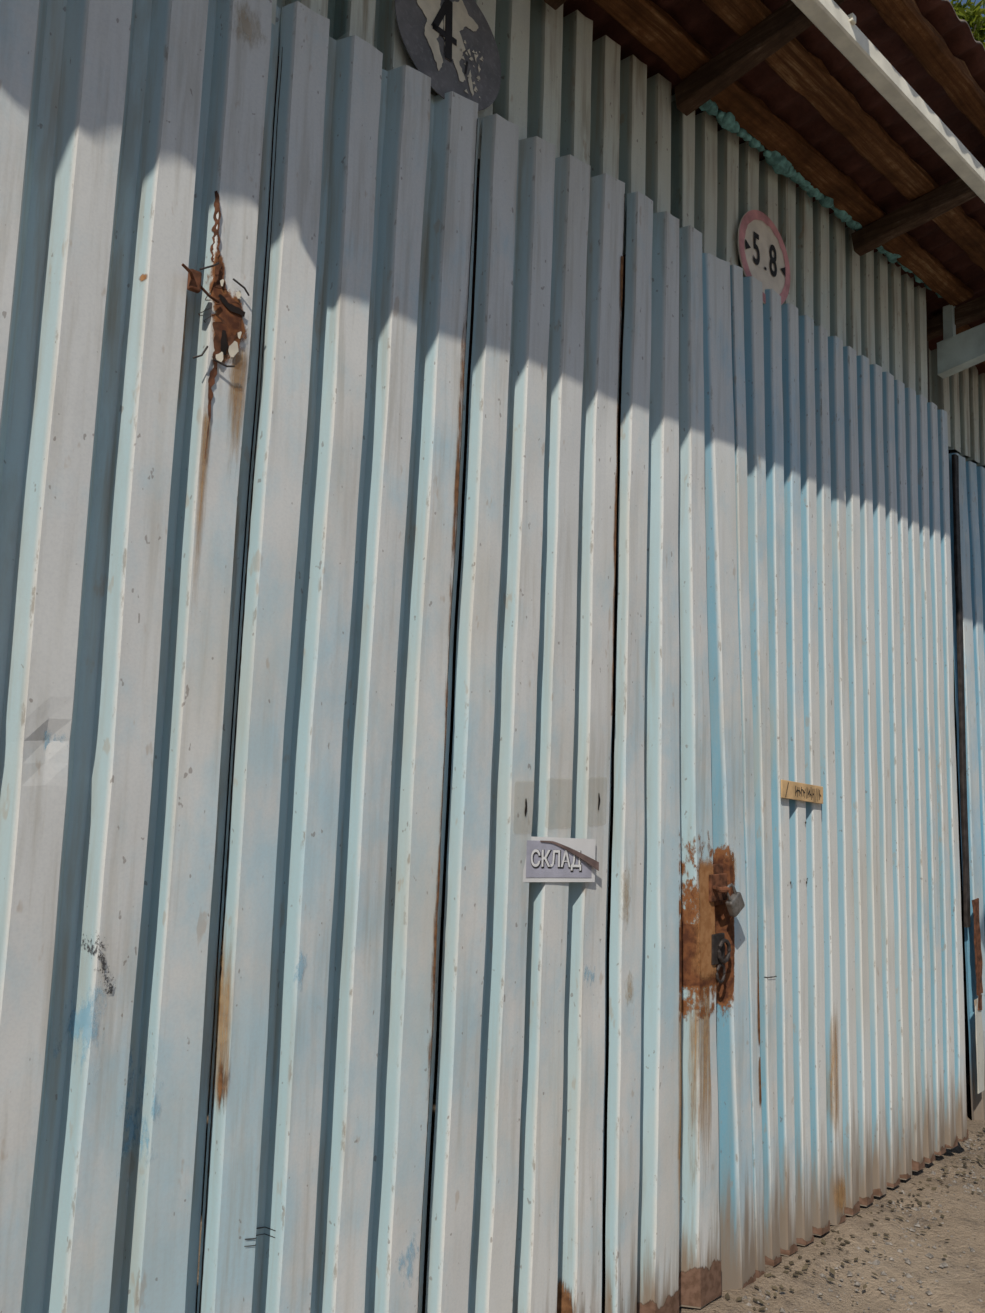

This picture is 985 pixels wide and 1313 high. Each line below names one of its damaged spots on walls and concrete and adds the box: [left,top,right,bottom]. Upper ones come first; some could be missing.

corrosion [207,252,247,437]
corrosion [199,416,210,525]
corrosion [216,959,230,1110]
corrosion [678,832,735,1176]
corrosion [742,1129,969,1289]
corrosion [557,1280,575,1313]
corrosion [637,1259,722,1313]